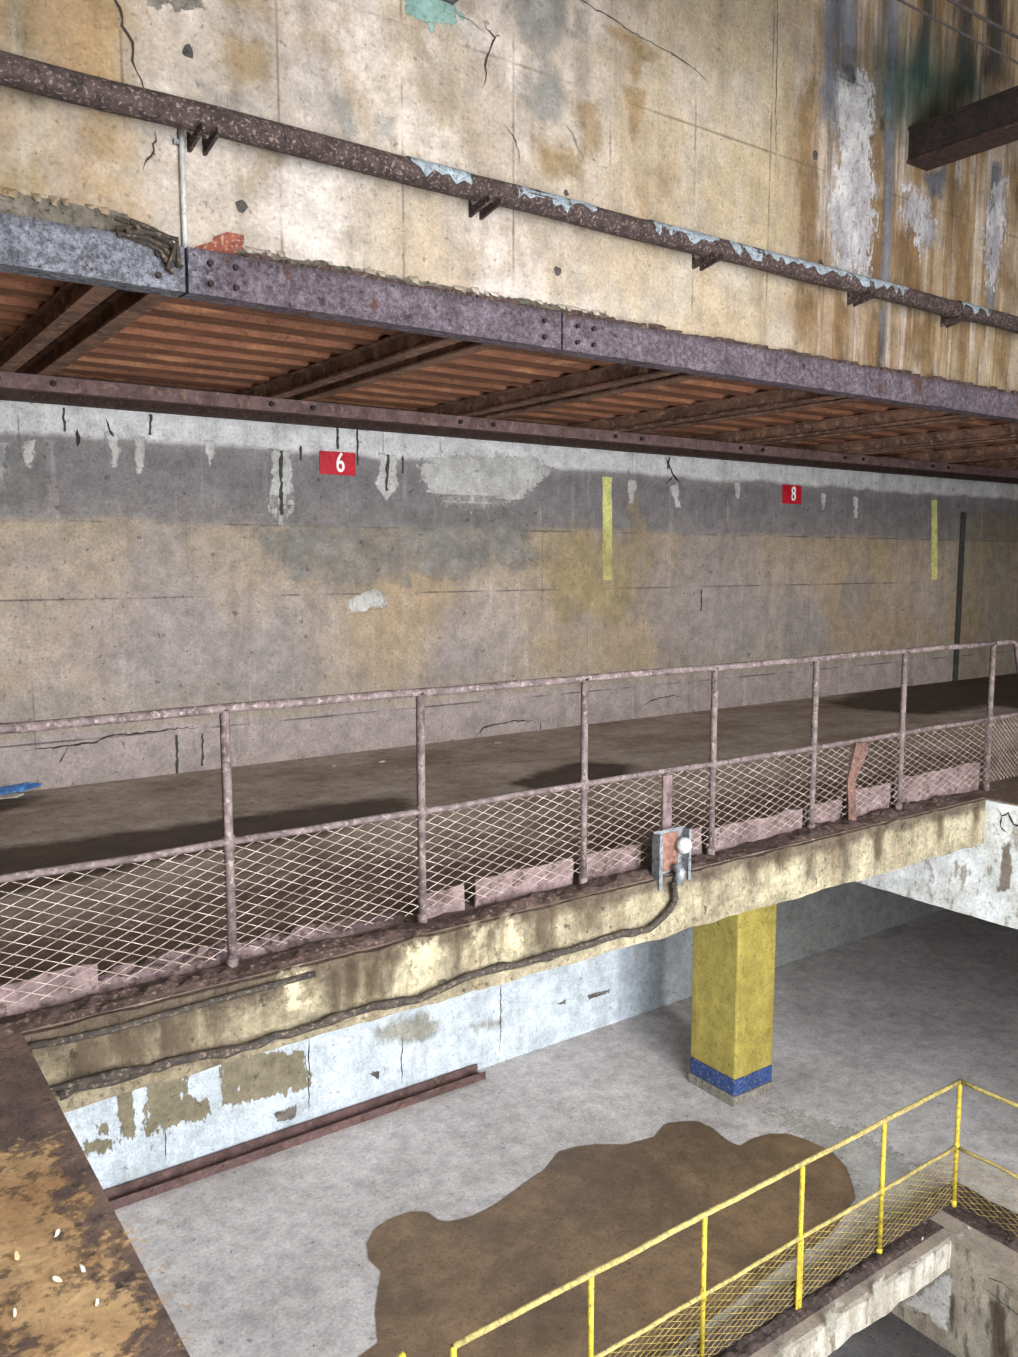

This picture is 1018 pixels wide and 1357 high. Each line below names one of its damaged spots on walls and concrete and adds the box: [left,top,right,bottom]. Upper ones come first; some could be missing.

crack [114,0,144,88]
spalling [147,0,205,12]
spalling [0,186,129,233]
rust [798,79,823,263]
rust [861,111,922,291]
water stain [815,0,1005,282]
water stain [981,163,1012,306]
water stain [877,308,885,368]
peeling [377,1014,438,1042]
peeling [83,1048,312,1157]
rust [0,1131,175,1357]
water stain [359,1102,937,1357]